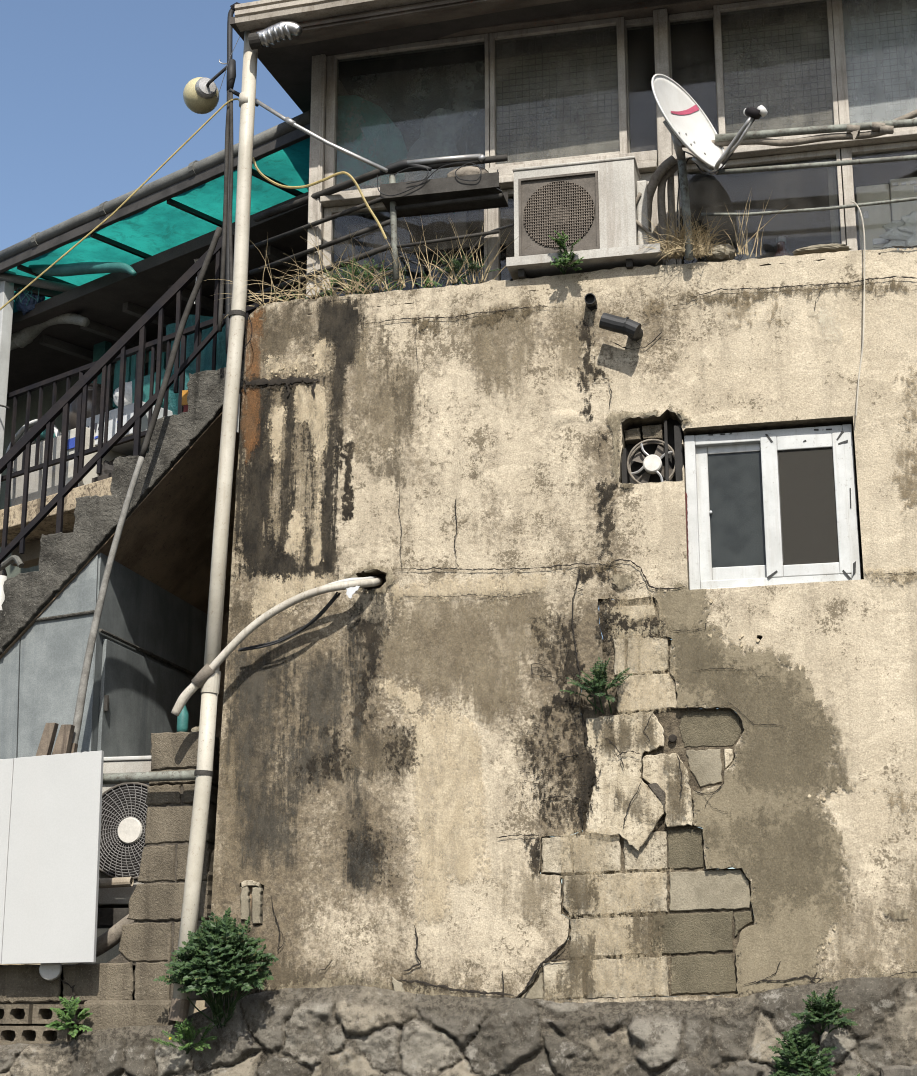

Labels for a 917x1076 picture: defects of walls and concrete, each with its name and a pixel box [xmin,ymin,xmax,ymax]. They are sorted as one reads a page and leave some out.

crack [874,243,917,251]
crack [673,276,917,310]
leakage [457,304,533,393]
leakage [555,302,608,457]
crack [611,332,676,350]
leakage [234,295,425,584]
crack [392,489,685,678]
leakage [216,582,586,925]
spalling [518,582,917,1003]
crack [399,926,568,998]
crack [744,961,823,985]